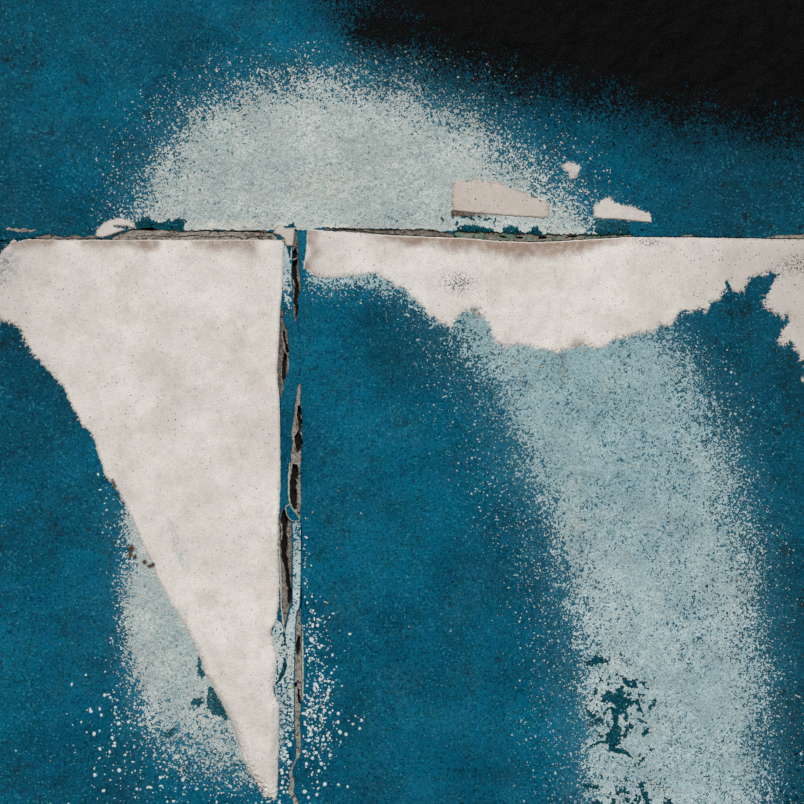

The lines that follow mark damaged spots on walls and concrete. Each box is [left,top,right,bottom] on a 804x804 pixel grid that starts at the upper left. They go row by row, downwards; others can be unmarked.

crack [324,221,644,242]
peeling [303,177,804,382]
crack [761,233,804,241]
peeling [0,216,296,803]
crack [6,220,304,804]
peeling [584,654,657,766]